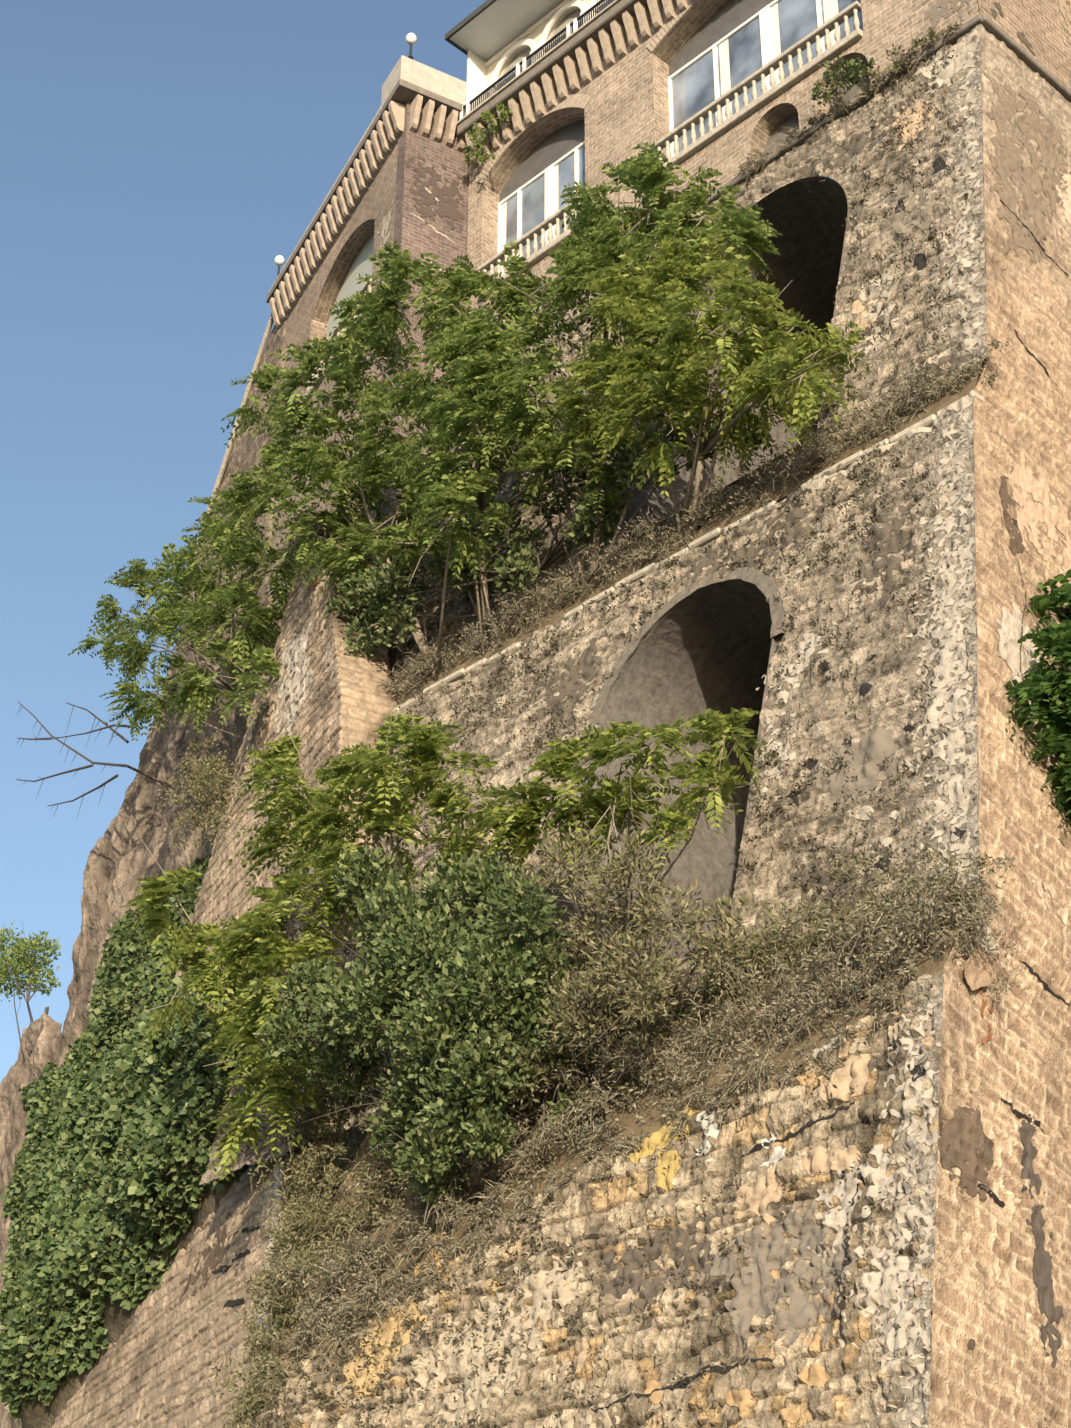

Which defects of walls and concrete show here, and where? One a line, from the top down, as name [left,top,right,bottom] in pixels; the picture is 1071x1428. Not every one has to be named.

crack [1001,1098,1047,1134]